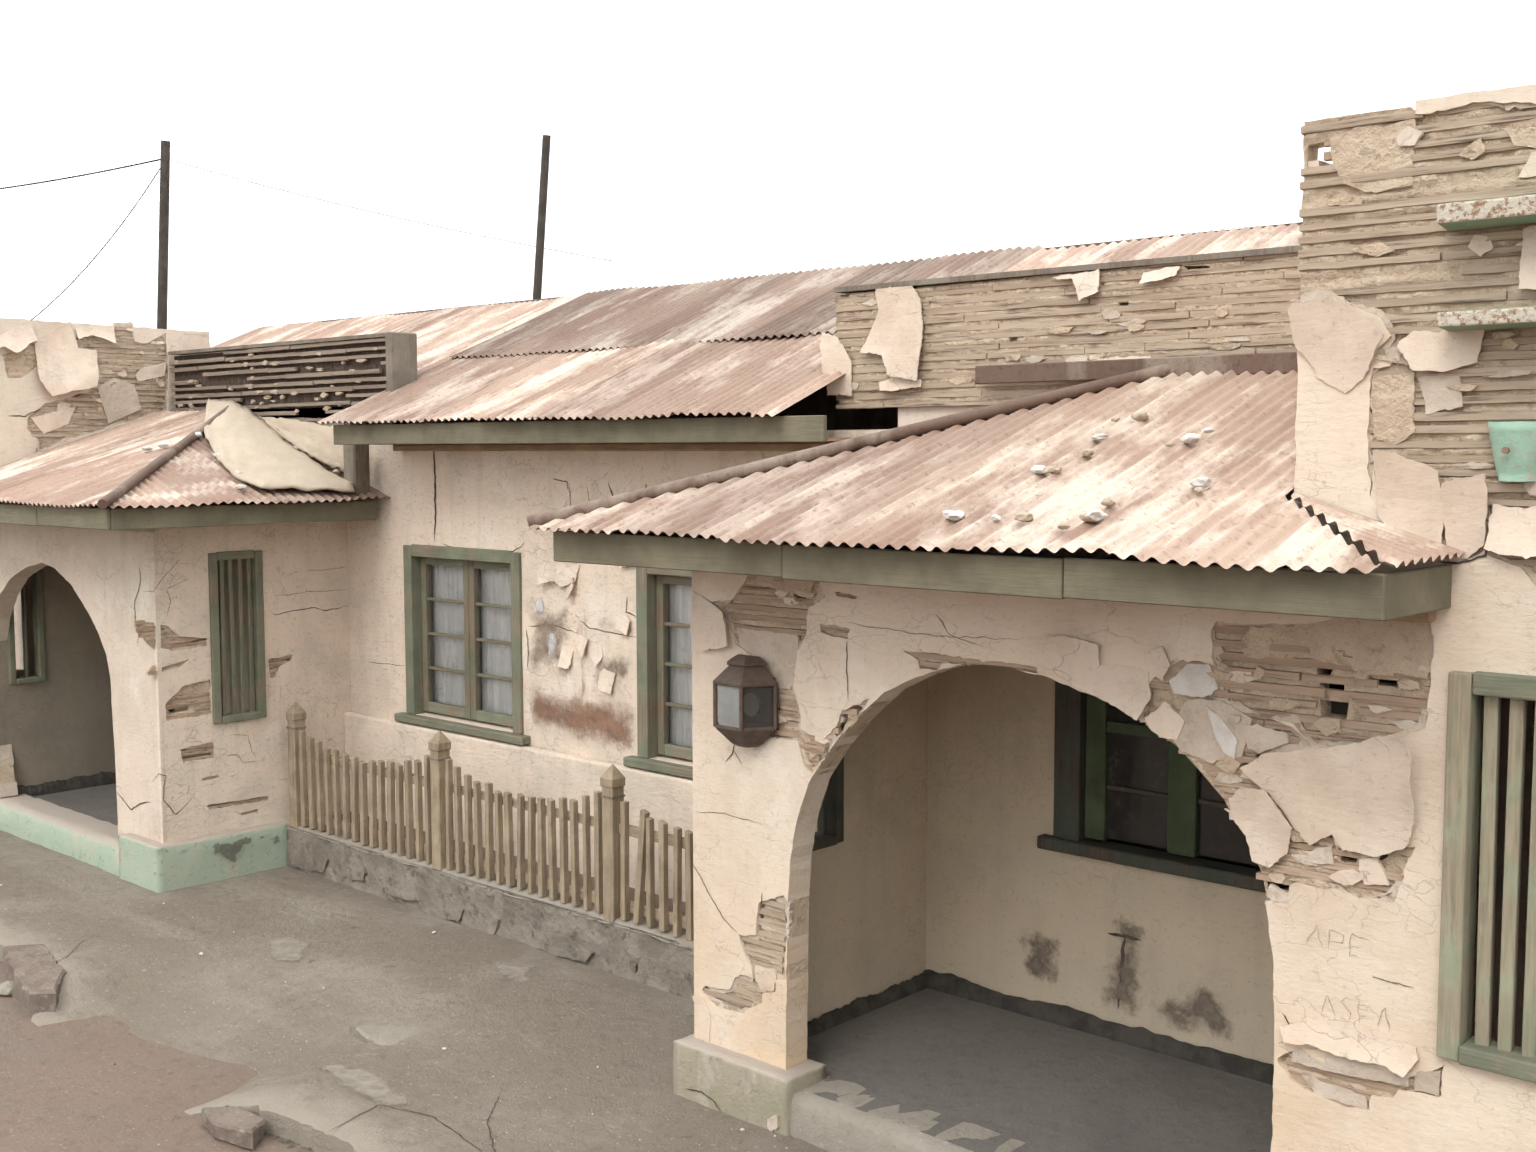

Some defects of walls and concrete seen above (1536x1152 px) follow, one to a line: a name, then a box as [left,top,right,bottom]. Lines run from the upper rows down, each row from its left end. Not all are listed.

flaking render [1052,269,1100,301]
flaking render [1139,266,1180,284]
spalling [0,322,168,454]
flaking render [819,286,923,396]
spalling [1287,102,1536,584]
spalling [133,620,212,720]
spalling [905,618,1434,903]
spalling [692,888,810,1043]
leakage [1026,937,1055,976]
leakage [1113,924,1137,1010]
spalling [1280,1018,1444,1110]